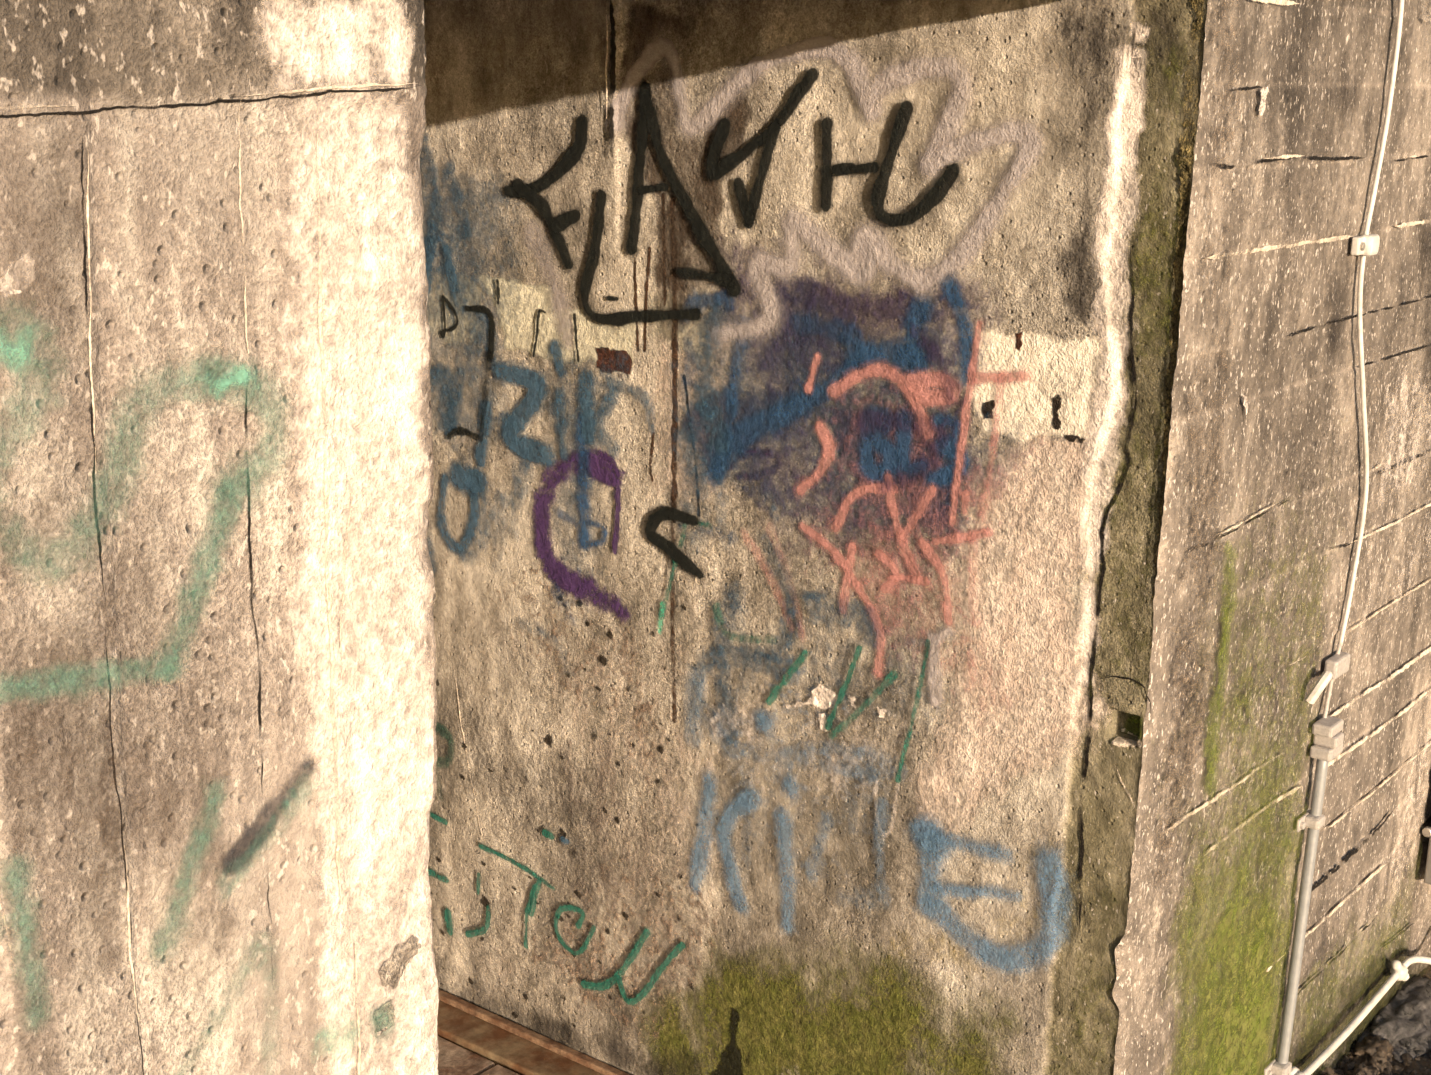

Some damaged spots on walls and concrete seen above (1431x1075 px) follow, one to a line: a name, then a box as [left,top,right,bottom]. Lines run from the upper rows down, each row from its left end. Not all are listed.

crack [0,83,421,1075]
leakage [266,0,438,1075]
leakage [622,5,749,495]
leakage [918,18,1176,830]
crack [1079,244,1431,931]
leakage [710,1008,750,1075]
leakage [1288,946,1428,1073]